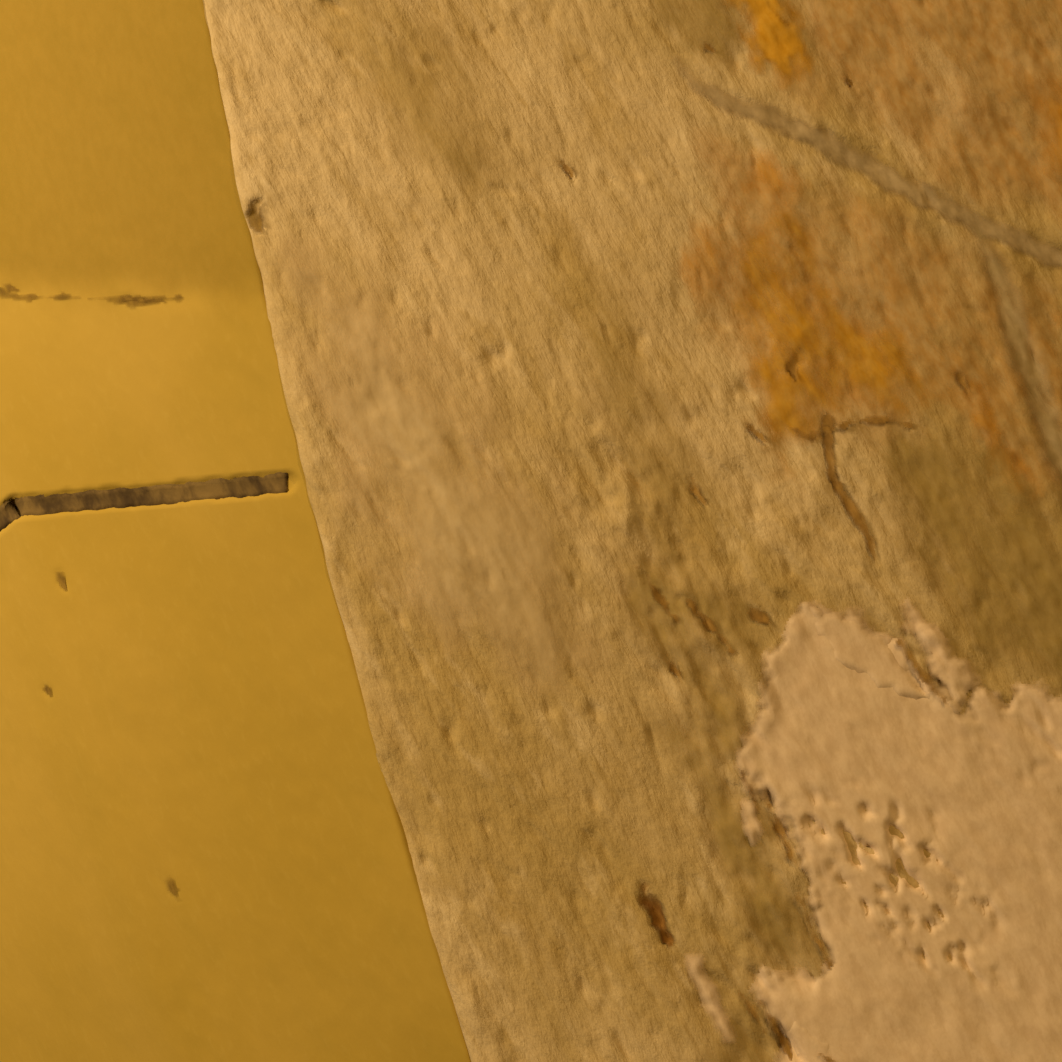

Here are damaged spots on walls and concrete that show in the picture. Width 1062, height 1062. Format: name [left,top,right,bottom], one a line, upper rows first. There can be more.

rust [728,0,809,75]
flaking render [737,599,1062,1062]
flaking render [687,955,733,1042]